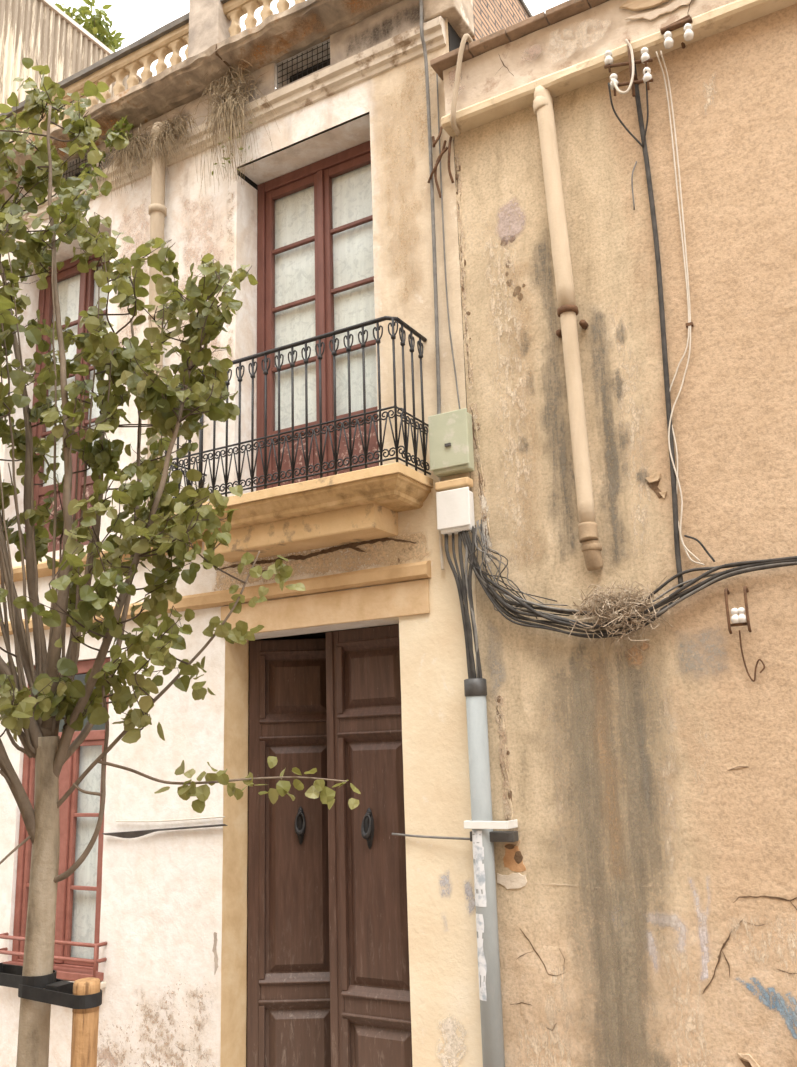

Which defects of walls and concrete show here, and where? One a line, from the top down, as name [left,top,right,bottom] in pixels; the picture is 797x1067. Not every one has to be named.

flaking render [522,20,608,61]
flaking render [619,0,693,21]
water stain [485,201,575,558]
water stain [592,310,650,561]
crack [216,537,417,573]
water stain [480,495,492,569]
spalling [495,695,526,872]
water stain [521,648,711,1067]
crack [517,925,565,976]
crack [696,879,797,994]
flaking render [97,983,205,1067]
flaking render [738,1053,760,1067]